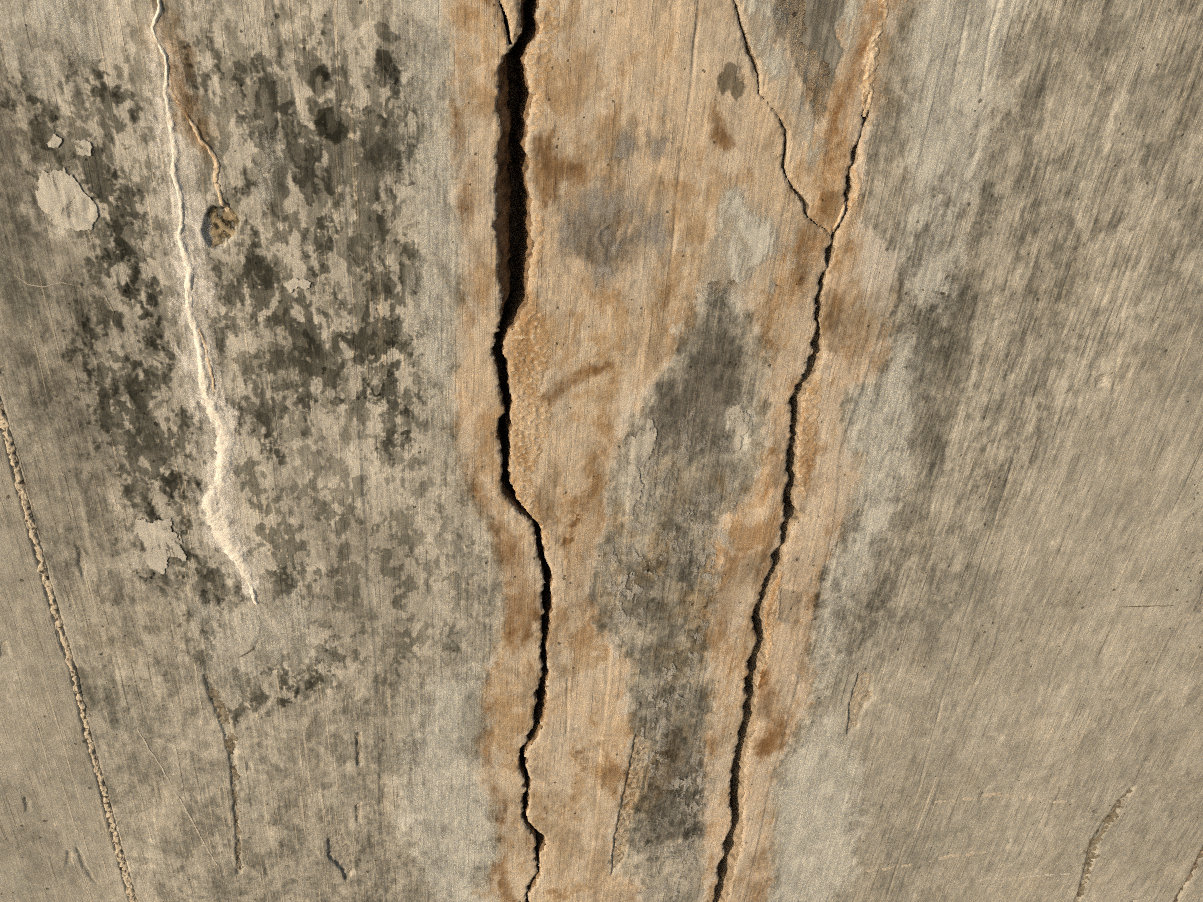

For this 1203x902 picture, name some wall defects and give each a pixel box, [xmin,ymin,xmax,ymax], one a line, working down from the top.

damp [260,80,329,201]
damp [393,75,430,124]
damp [81,330,138,434]
damp [90,0,262,657]
damp [256,273,320,367]
damp [356,274,454,415]
crack [491,0,560,902]
crack [713,0,870,902]
damp [278,676,307,707]